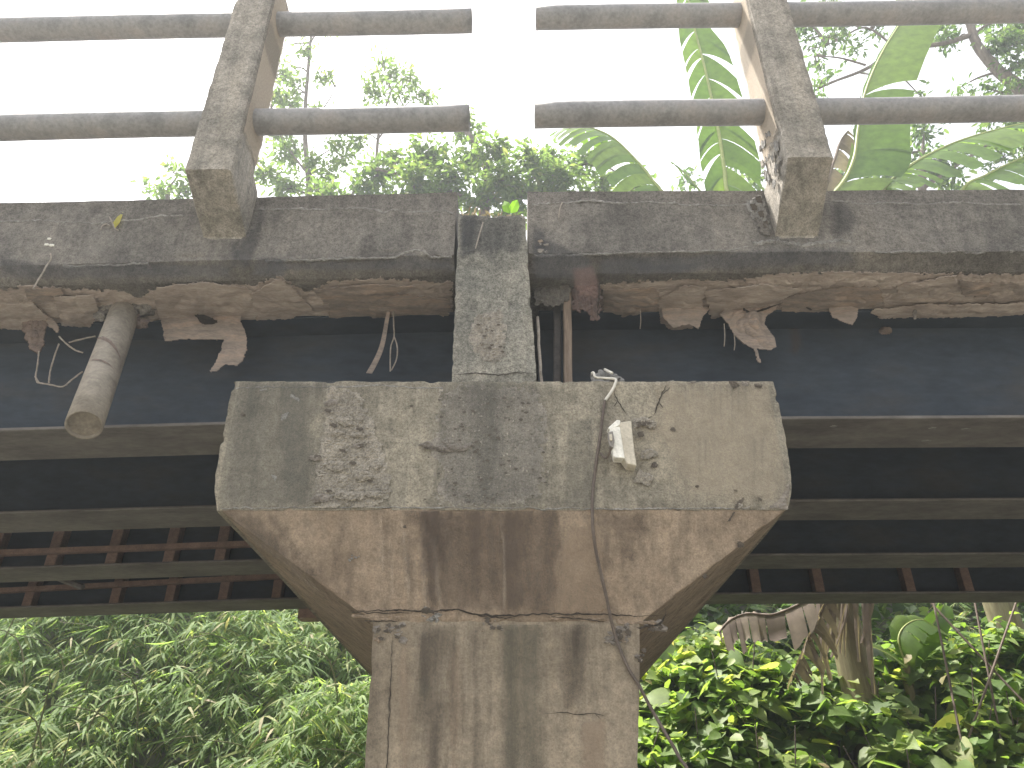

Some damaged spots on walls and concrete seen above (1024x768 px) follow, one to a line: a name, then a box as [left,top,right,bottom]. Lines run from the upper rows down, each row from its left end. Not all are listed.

peeling [759,131,782,189]
peeling [0,294,99,330]
peeling [152,279,312,321]
peeling [328,294,452,318]
peeling [602,287,660,317]
peeling [779,280,1024,319]
crack [614,386,670,418]
crack [347,609,666,768]